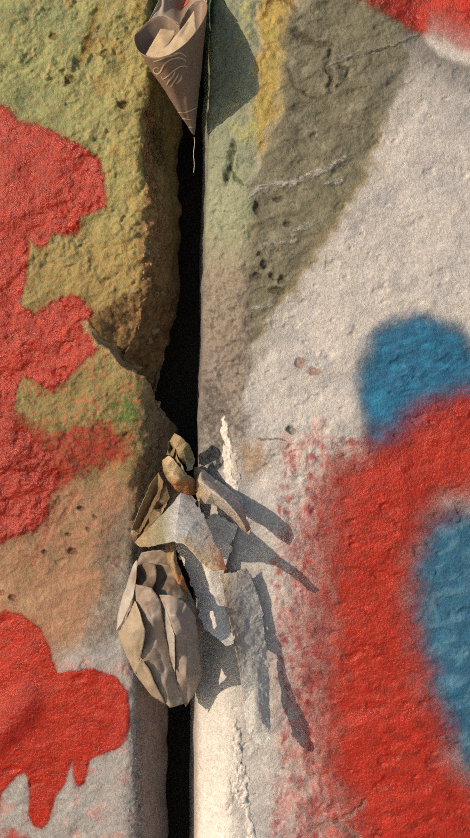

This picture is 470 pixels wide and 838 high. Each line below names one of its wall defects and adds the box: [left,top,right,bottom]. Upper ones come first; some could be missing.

peeling [81,111,271,838]
spalling [295,357,320,375]